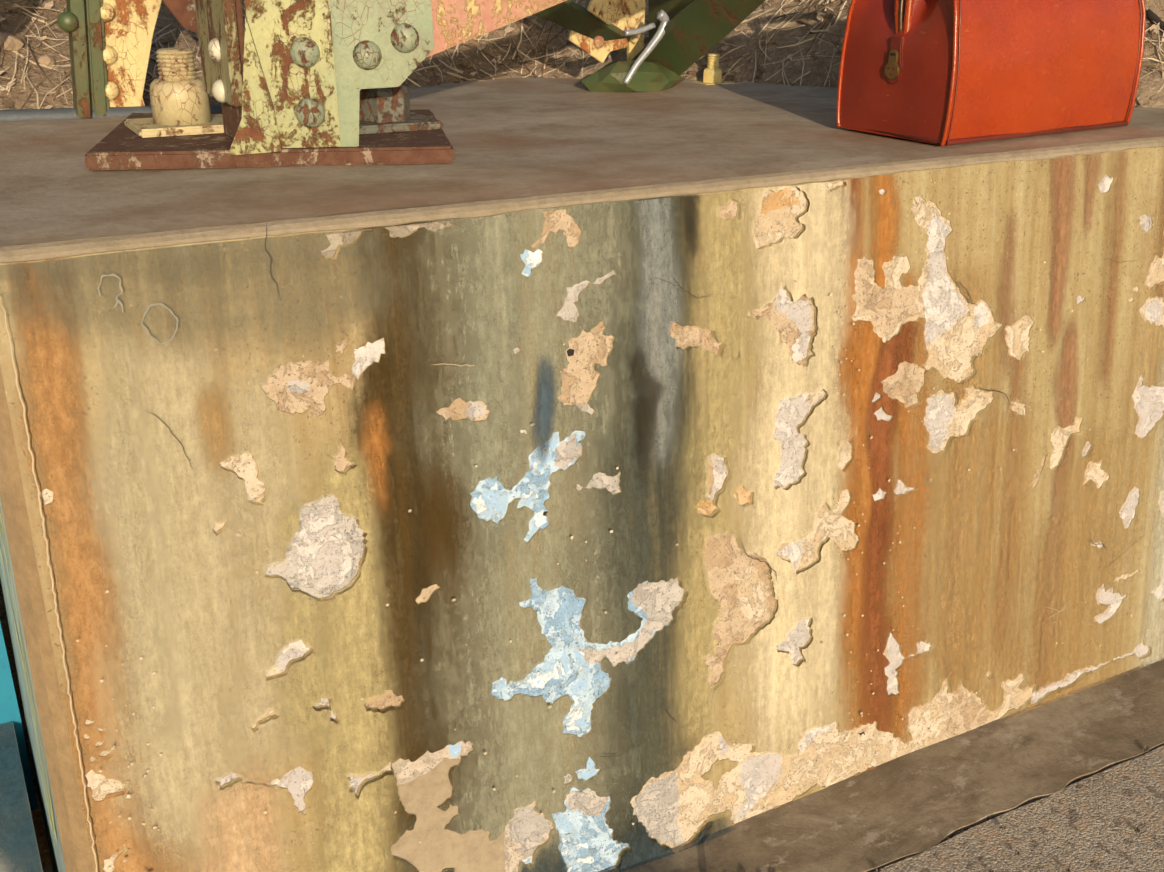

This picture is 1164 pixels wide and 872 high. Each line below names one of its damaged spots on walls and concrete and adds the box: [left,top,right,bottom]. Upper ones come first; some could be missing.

peeling [557,270,616,415]
peeling [851,196,1034,453]
corrosion [13,258,186,872]
peeling [263,494,365,598]
corrosion [362,410,387,501]
leakage [36,180,849,872]
peeling [470,430,586,542]
corrosion [832,174,930,738]
peeling [490,578,684,737]
corrosion [205,784,278,872]
peeling [504,757,629,872]
peeling [630,633,1149,848]